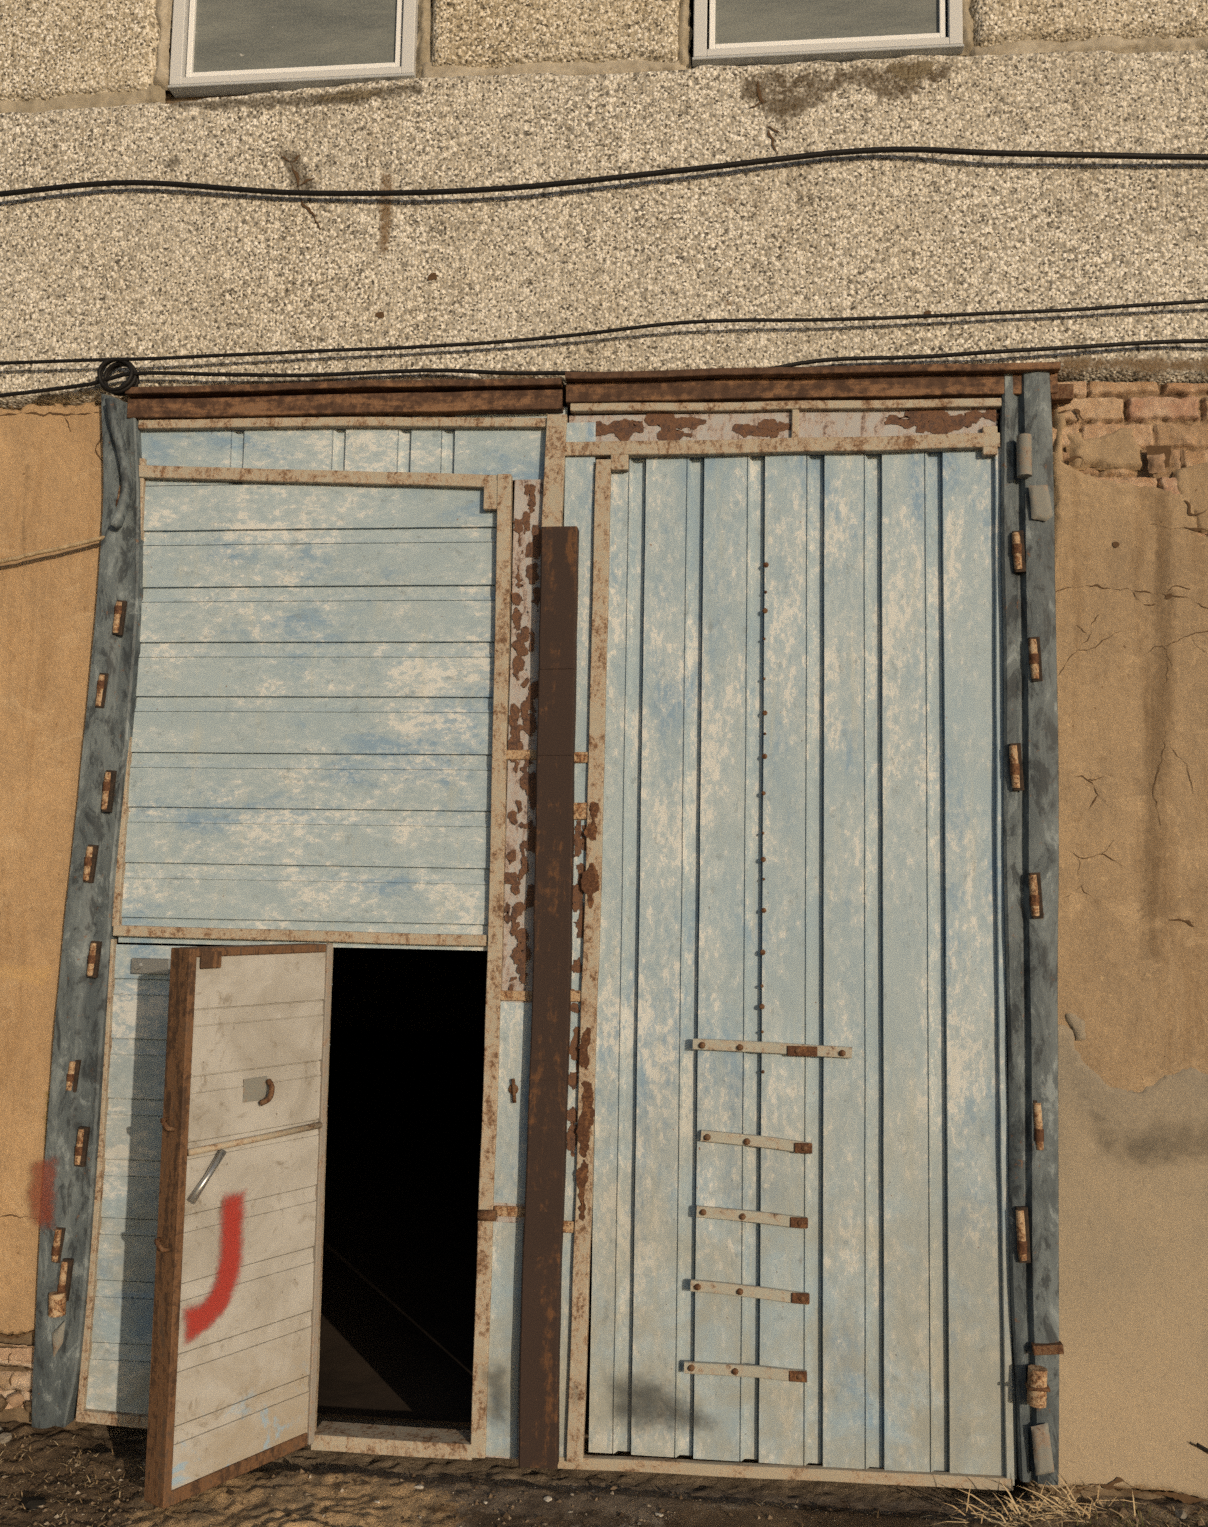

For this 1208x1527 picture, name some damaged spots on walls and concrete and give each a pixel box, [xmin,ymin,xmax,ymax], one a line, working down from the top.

water stain [743,60,950,129]
flaking render [1051,381,1208,536]
crack [1055,584,1208,825]
rust [581,862,600,909]
rust [584,802,599,841]
crack [1067,775,1123,901]
crack [1169,919,1195,927]
rust [576,1027,595,1221]
flaking render [1031,1013,1208,1500]
spalling [0,1331,35,1413]